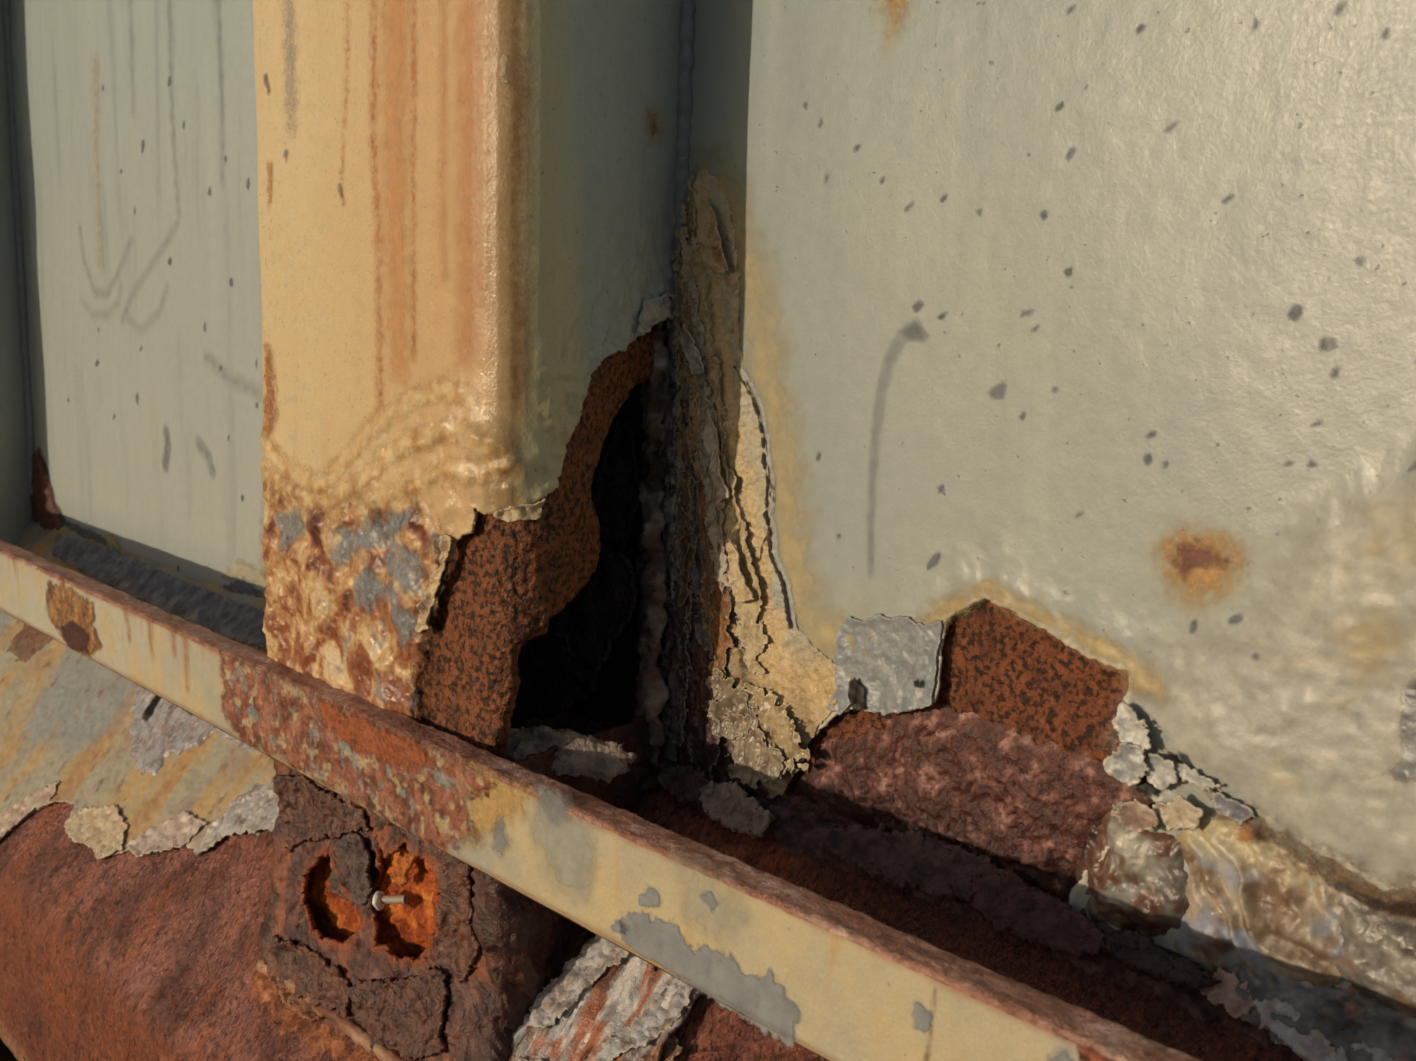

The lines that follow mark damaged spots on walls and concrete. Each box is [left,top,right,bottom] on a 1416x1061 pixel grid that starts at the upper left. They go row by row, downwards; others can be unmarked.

corrosion [30,448,64,530]
crack [734,365,797,629]
peeling [14,521,267,654]
peeling [410,170,1416,1061]
corrosion [1162,532,1243,601]
peeling [0,610,279,860]
corrosion [218,650,532,850]
corrosion [654,761,776,840]
corrosion [791,703,1150,961]
peeling [251,966,371,1061]
corrosion [1077,1046,1113,1061]